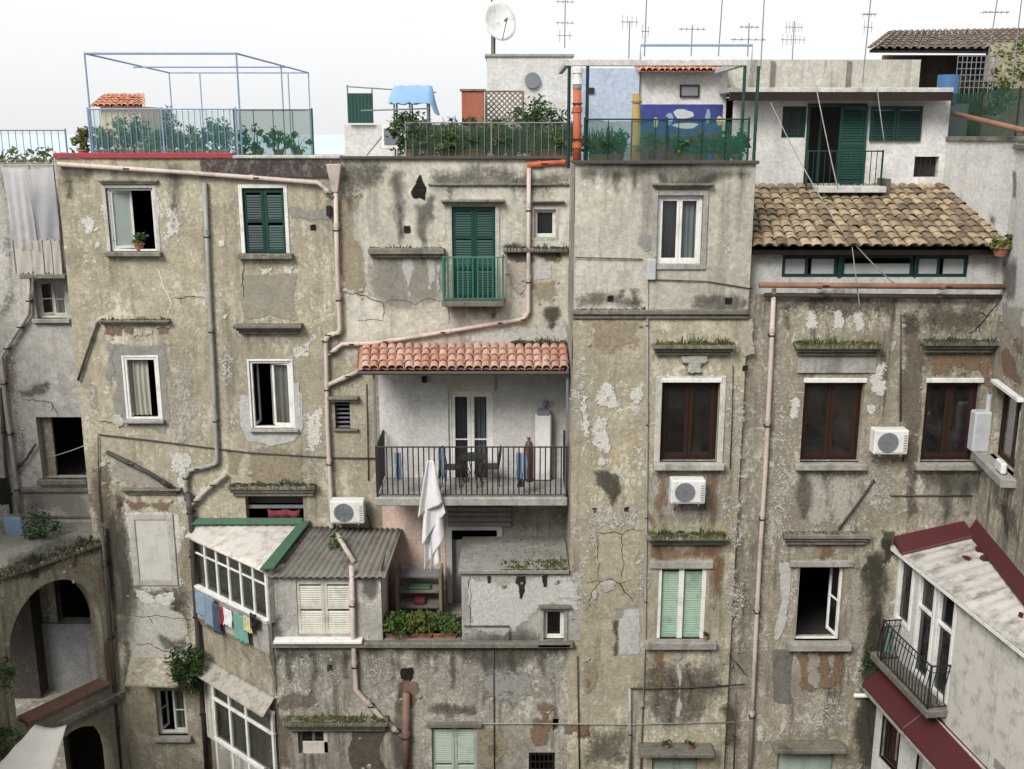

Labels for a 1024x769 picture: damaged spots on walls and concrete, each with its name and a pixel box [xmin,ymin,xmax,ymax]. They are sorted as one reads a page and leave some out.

spalling [411,175,426,200]
crack [157,268,204,317]
crack [343,291,450,321]
peeling [805,308,819,332]
peeling [832,309,865,332]
peeling [227,383,325,484]
peeling [570,319,645,477]
water stain [595,471,621,505]
peeling [87,449,207,670]
crack [587,529,642,606]
spalling [794,550,868,732]
water stain [854,531,894,769]